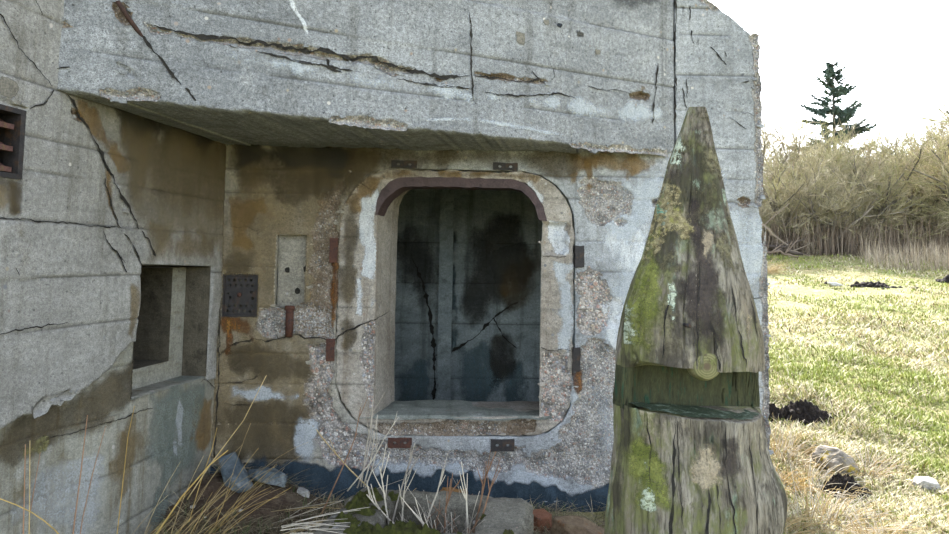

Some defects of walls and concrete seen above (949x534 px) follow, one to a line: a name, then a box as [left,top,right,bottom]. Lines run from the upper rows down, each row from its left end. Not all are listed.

rust [116,0,143,37]
crack [143,12,630,101]
crack [0,14,156,273]
spalling [328,114,408,131]
rust [0,179,21,213]
spalling [577,176,635,228]
crack [0,322,68,335]
damp [0,364,133,464]
rust [221,317,253,355]
crack [201,303,388,458]
spalling [255,186,624,489]
crack [411,254,518,400]